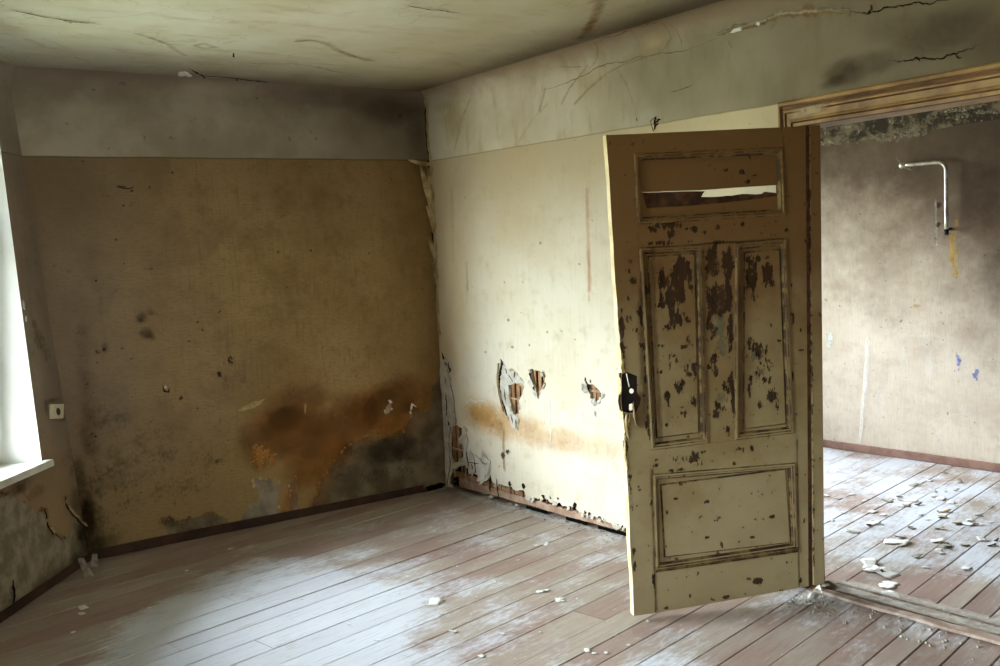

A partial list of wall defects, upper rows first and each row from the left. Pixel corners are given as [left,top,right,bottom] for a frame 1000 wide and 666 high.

crack [541,0,948,91]
crack [889,46,975,62]
flaking render [312,353,633,536]
flaking render [0,491,88,612]